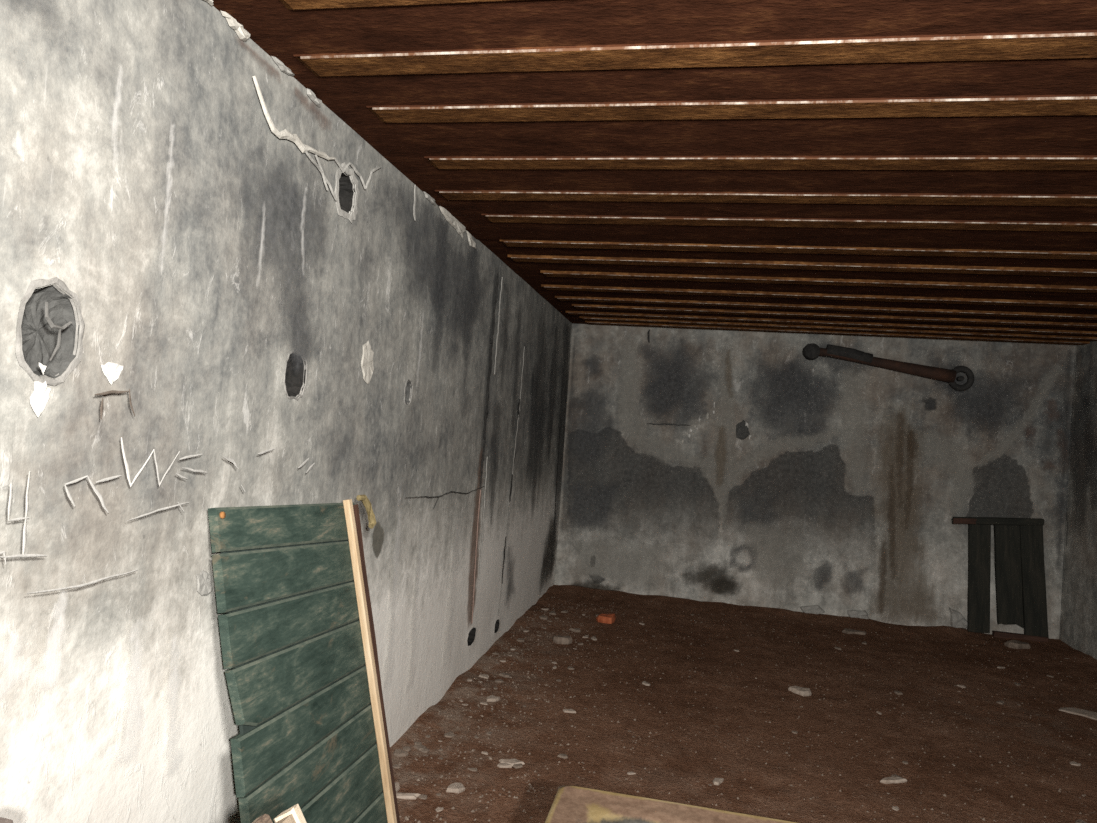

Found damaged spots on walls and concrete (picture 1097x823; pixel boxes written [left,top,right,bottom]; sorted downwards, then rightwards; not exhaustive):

crack [252,75,382,201]
spalling [16,277,85,417]
flaking render [361,340,374,384]
leakage [541,523,556,584]